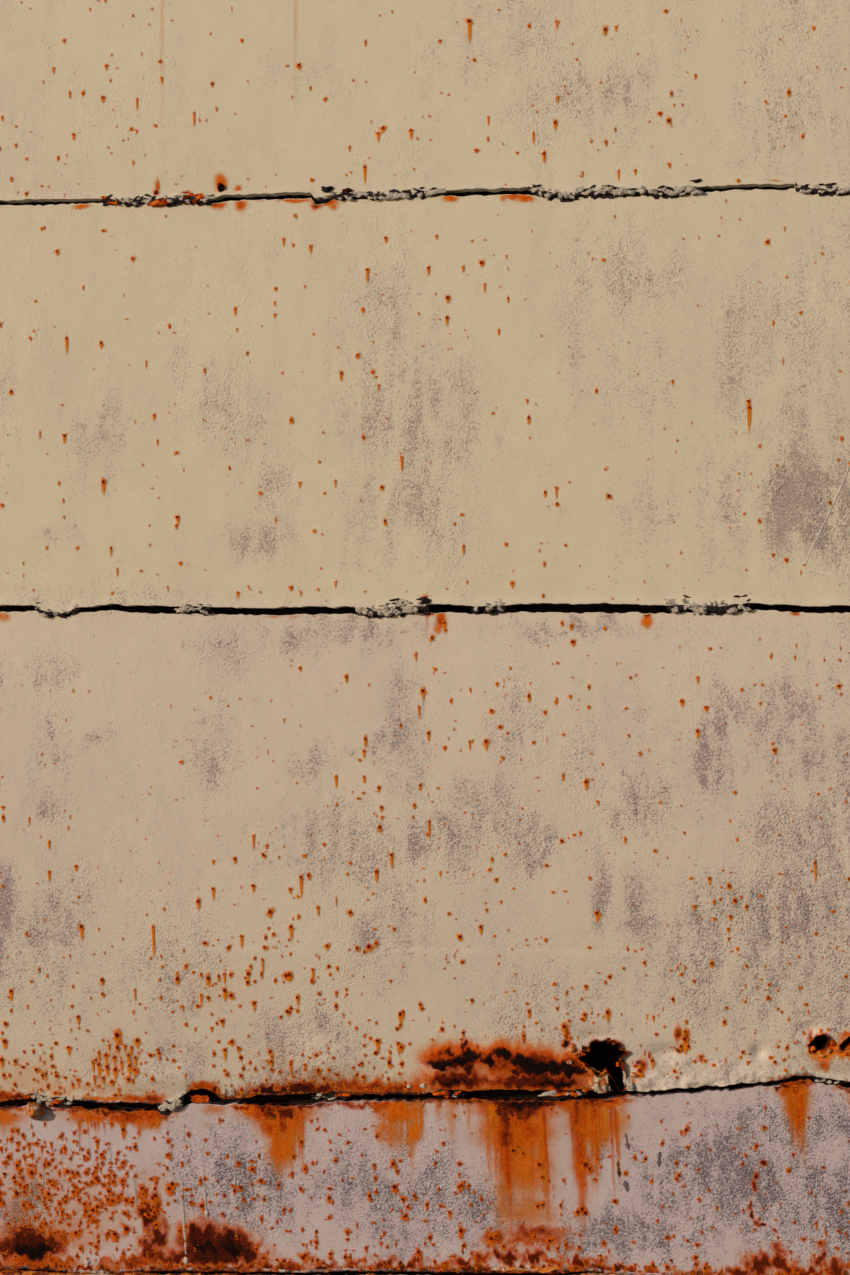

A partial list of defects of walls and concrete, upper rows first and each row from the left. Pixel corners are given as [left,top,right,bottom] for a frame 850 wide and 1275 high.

rust [68,53,157,154]
rust [345,121,386,183]
peeling [101,193,218,208]
rust [210,174,276,210]
rust [282,178,337,219]
peeling [320,187,448,206]
peeling [528,184,704,202]
peeling [794,182,850,197]
peeling [663,594,752,615]
rust [334,735,445,848]
rust [0,827,850,1275]
peeling [538,1043,638,1100]